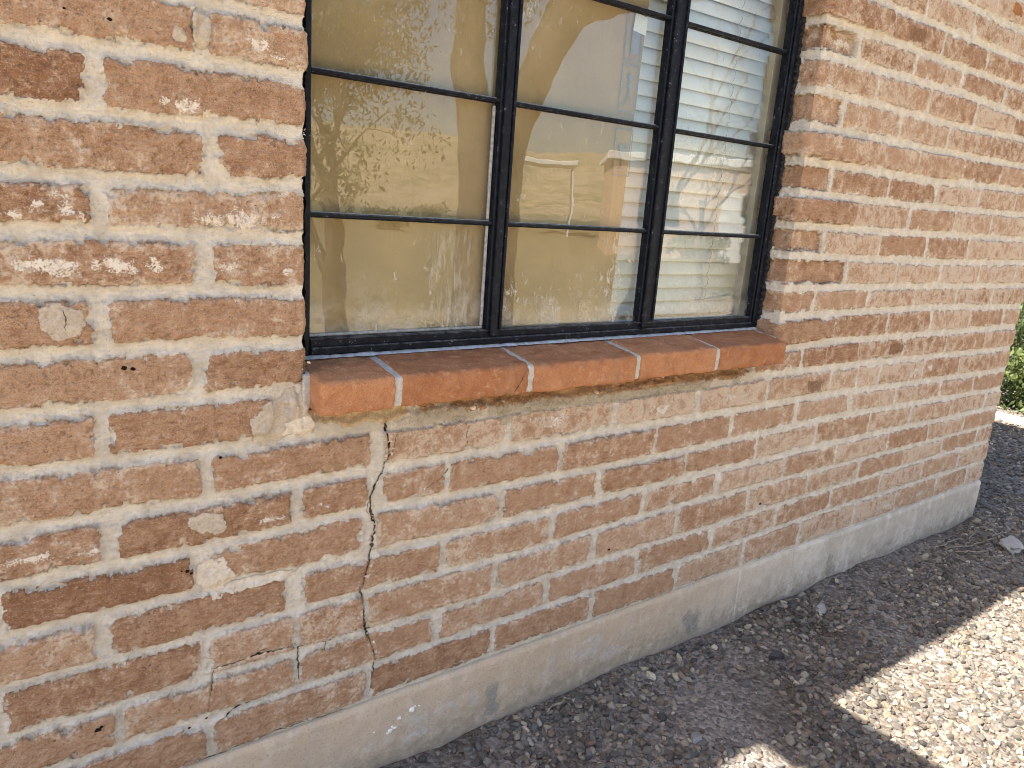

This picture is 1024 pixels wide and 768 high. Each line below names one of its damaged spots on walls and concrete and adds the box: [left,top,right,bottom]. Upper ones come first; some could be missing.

leakage [4,188,86,224]
leakage [189,205,283,231]
leakage [7,251,163,279]
crack [209,421,398,720]